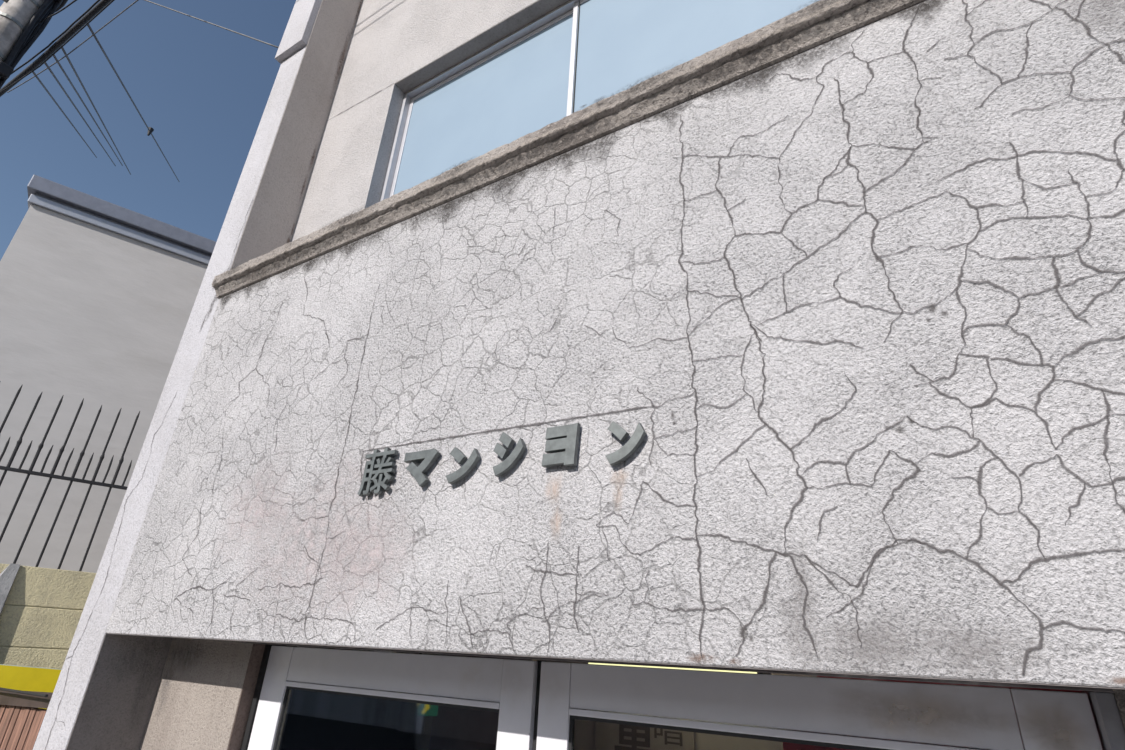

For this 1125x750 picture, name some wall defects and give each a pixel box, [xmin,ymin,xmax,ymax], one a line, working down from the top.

leakage [410,136,608,225]
crack [175,0,1125,675]